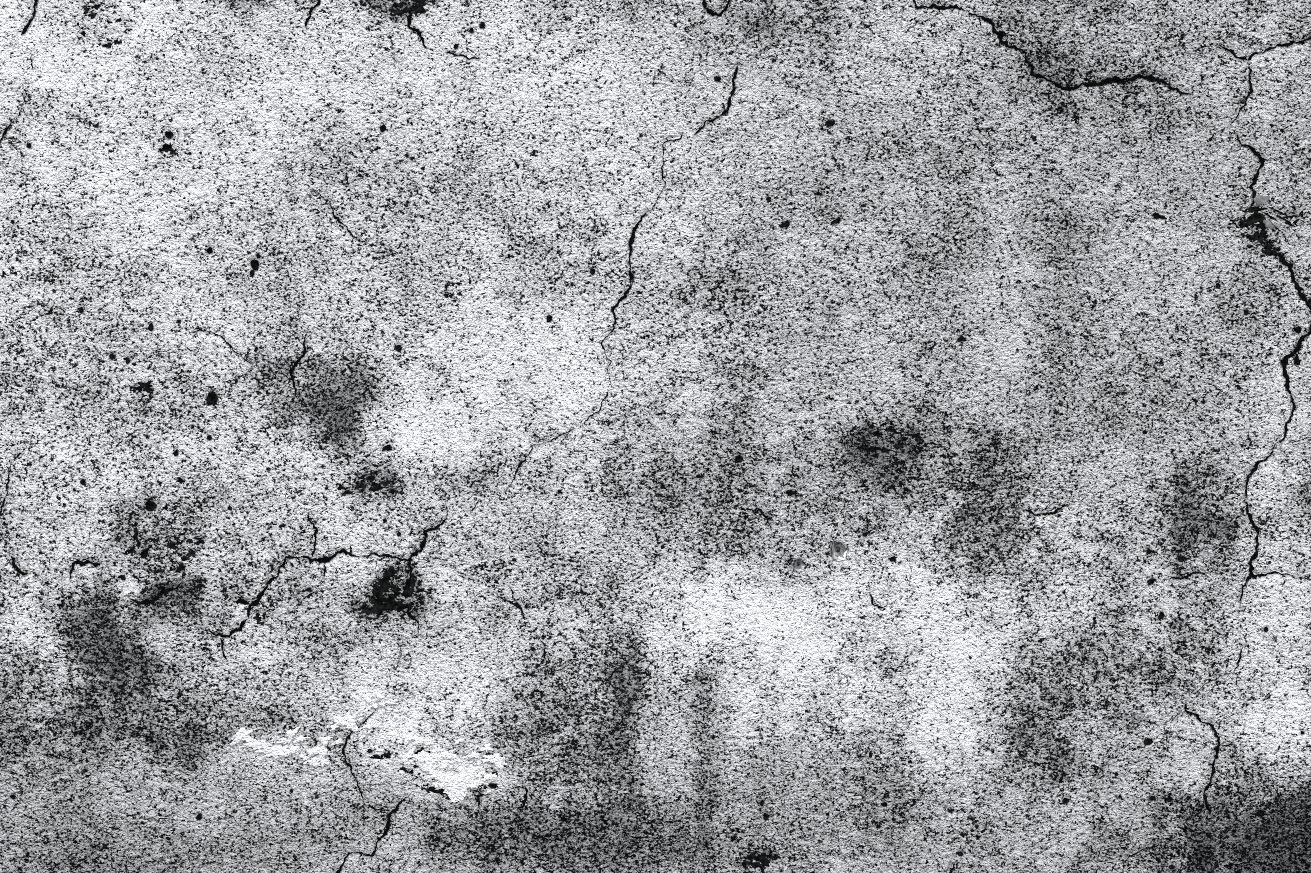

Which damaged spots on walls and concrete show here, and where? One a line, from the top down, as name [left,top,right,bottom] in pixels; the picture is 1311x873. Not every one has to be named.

crack [0,0,38,143]
crack [913,0,1193,96]
crack [1215,36,1311,205]
crack [211,0,800,669]
crack [1169,249,1311,608]
water stain [0,488,305,789]
water stain [268,775,405,854]
crack [336,709,409,873]
peeling [230,693,519,810]
water stain [415,610,771,873]
water stain [984,427,1311,873]
crack [1131,647,1243,811]